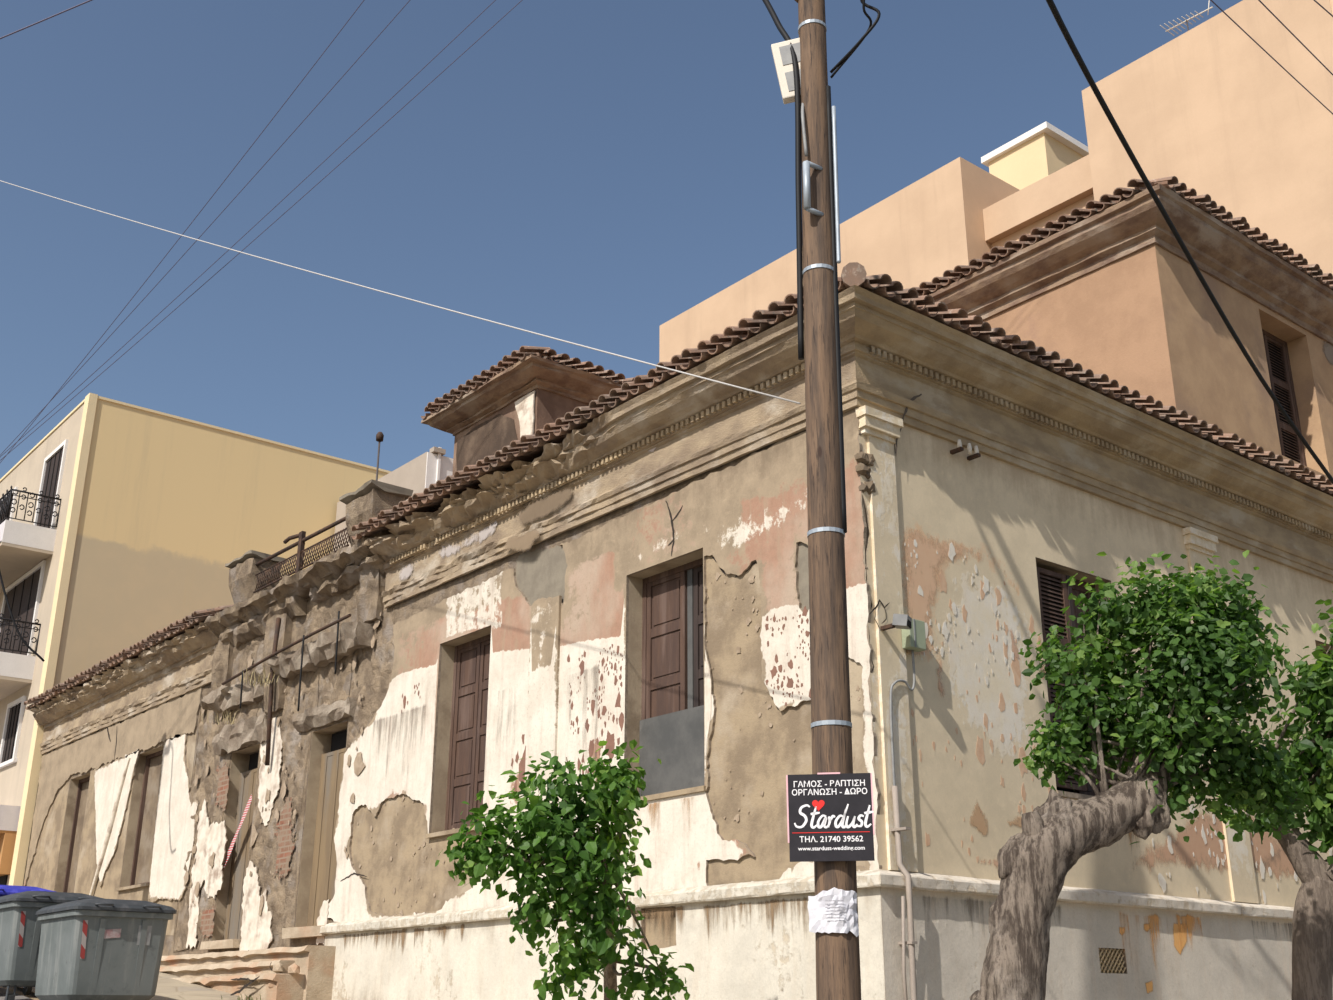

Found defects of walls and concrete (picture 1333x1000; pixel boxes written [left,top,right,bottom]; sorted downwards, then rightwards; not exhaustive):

spalling [440,488,572,606]
crack [666,501,683,556]
spalling [74,565,420,952]
peeling [567,644,624,784]
spalling [705,542,812,886]
peeling [904,531,1051,827]
spalling [26,779,70,891]
spalling [344,793,482,916]
peeling [961,804,998,867]
spalling [255,961,300,988]